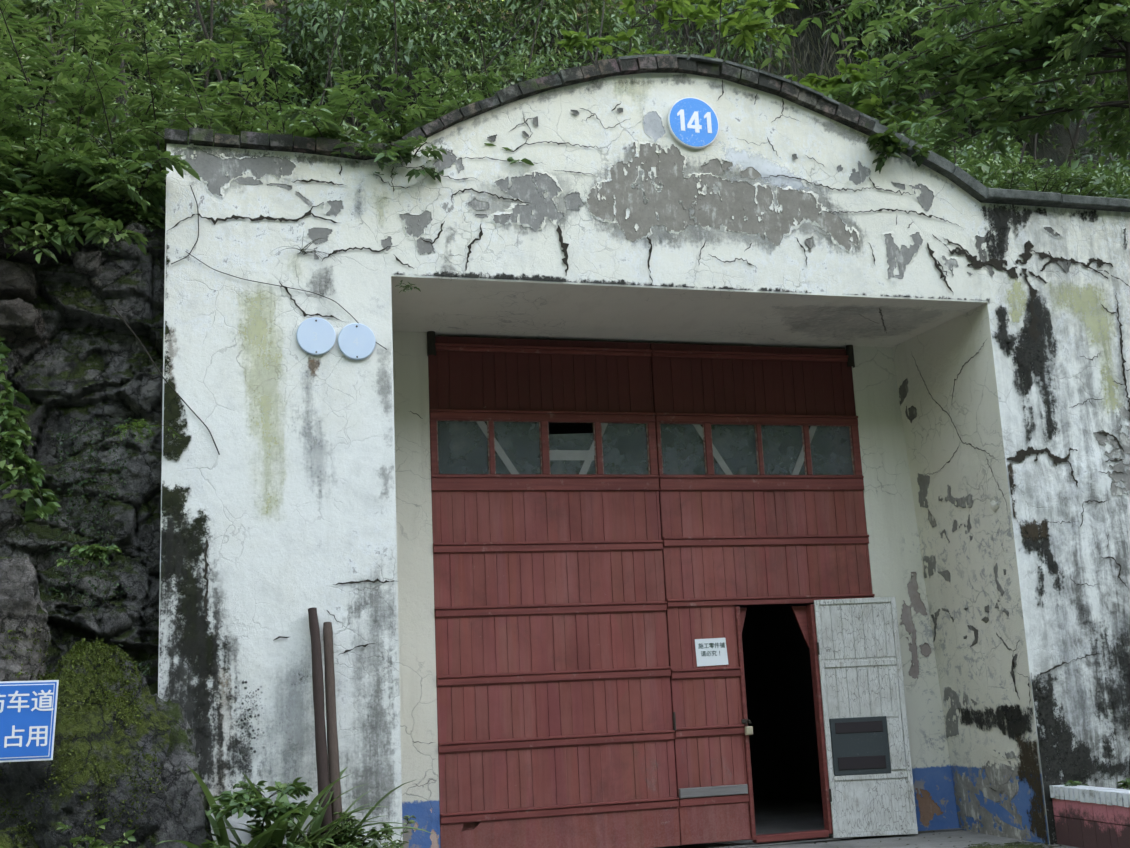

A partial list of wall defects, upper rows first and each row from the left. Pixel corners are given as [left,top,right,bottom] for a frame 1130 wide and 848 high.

crack [279,281,343,322]
crack [169,101,631,275]
spalling [377,209,435,255]
spalling [466,107,860,254]
spalling [881,231,924,280]
crack [737,94,1130,412]
leakage [982,204,1099,259]
leakage [163,321,191,462]
crack [911,339,1125,527]
leakage [159,484,264,798]
spalling [900,554,968,679]
leakage [958,608,1130,845]